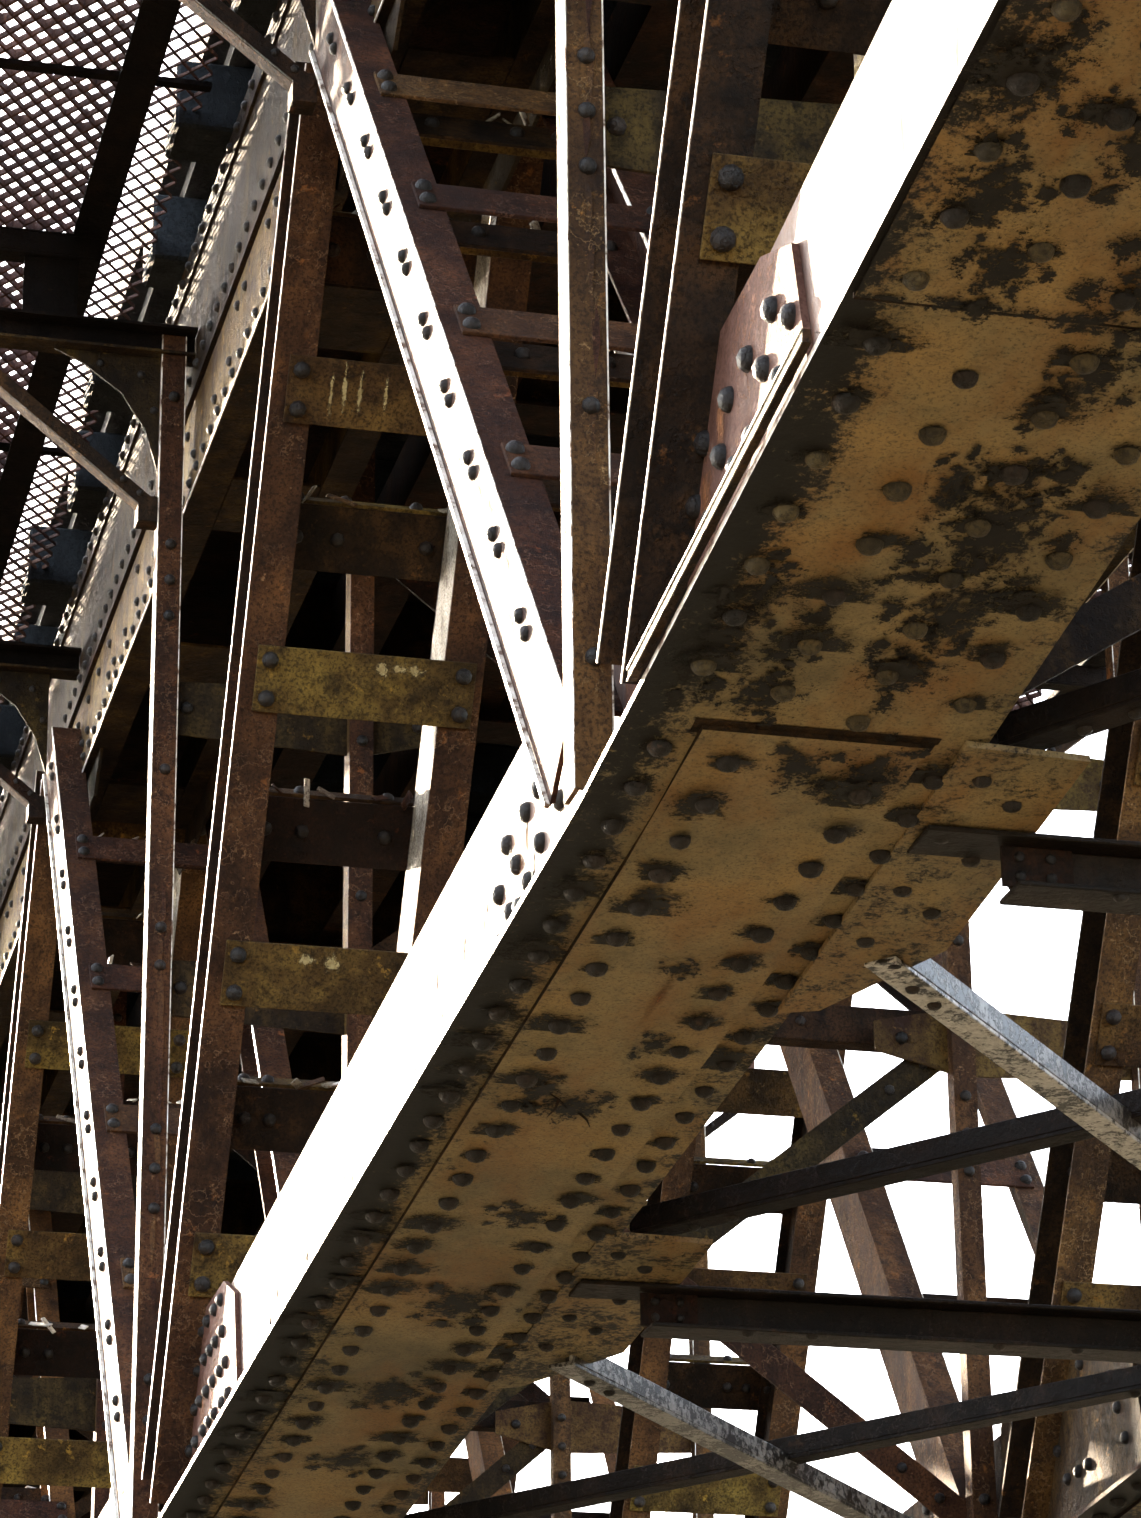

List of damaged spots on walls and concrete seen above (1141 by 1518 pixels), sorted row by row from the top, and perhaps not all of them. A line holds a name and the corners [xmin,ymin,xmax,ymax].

peeling [505,822,534,902]
peeling [405,1282,513,1329]